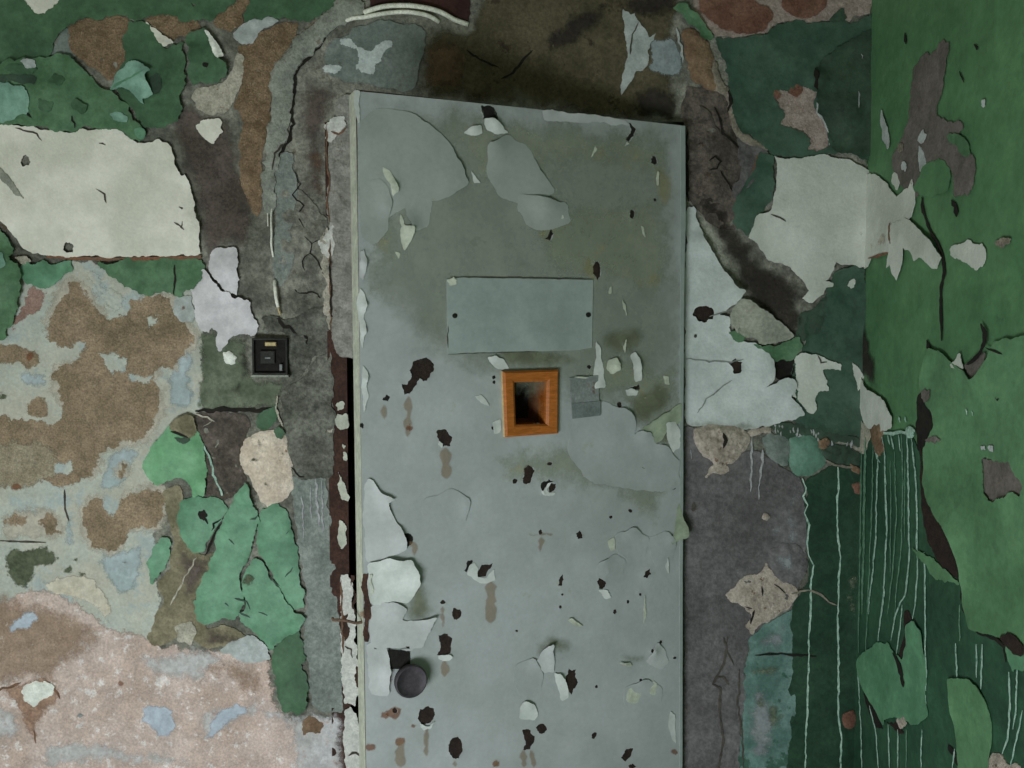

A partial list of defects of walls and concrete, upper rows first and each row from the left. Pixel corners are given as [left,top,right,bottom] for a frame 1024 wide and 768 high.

flaking render [0,0,359,768]
crack [269,37,332,315]
rust [402,357,434,394]
leakage [424,0,684,119]
leakage [703,197,800,344]
peeling [673,0,1024,768]
crack [921,197,1001,379]
crack [915,393,1006,662]